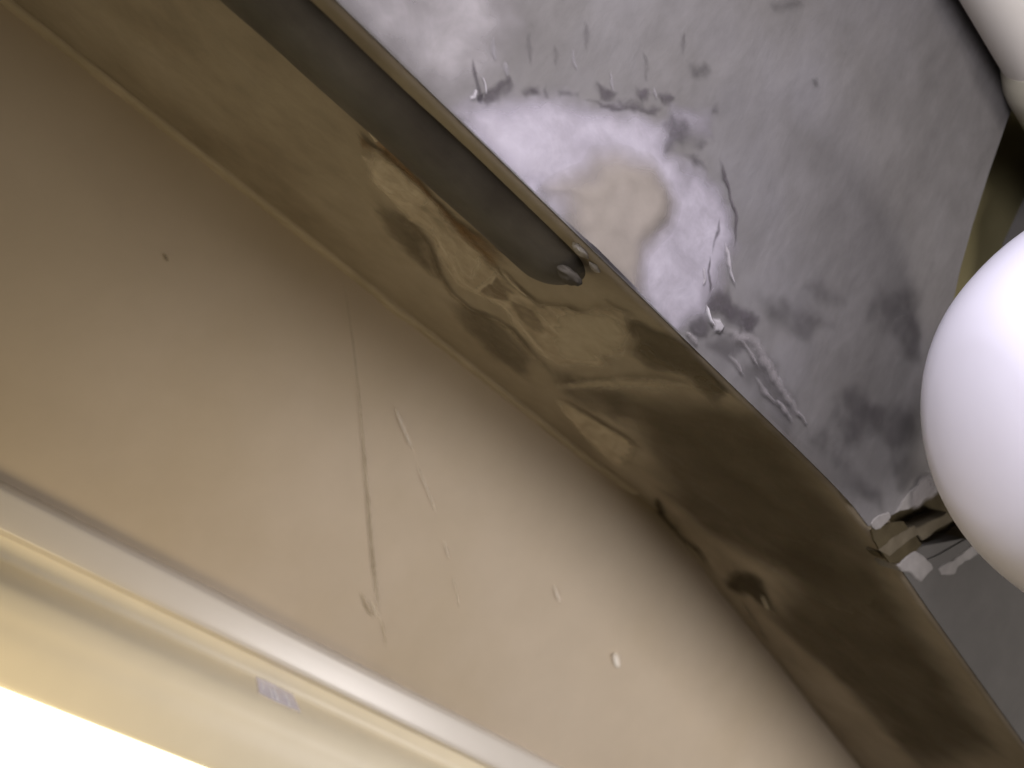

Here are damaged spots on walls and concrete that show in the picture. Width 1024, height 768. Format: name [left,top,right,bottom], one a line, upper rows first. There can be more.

damp [356,0,498,81]
flaking render [688,294,807,424]
crack [350,325,377,615]
damp [462,103,979,753]
peeling [912,476,938,507]